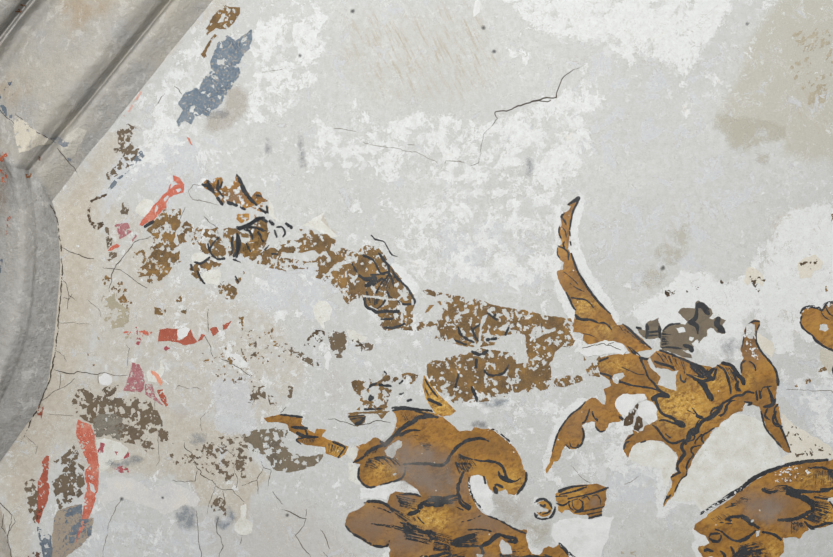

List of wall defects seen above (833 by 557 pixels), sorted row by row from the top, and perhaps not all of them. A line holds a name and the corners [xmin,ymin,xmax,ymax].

peeling [201,5,240,58]
crack [334,68,578,166]
peeling [87,194,117,261]
crack [61,236,151,292]
crack [42,345,130,416]
peeling [202,316,374,405]
crack [0,503,15,557]
peeling [24,479,45,536]
peeling [52,445,85,510]
peeling [72,384,323,481]
crack [174,443,330,557]
spalling [345,447,360,485]